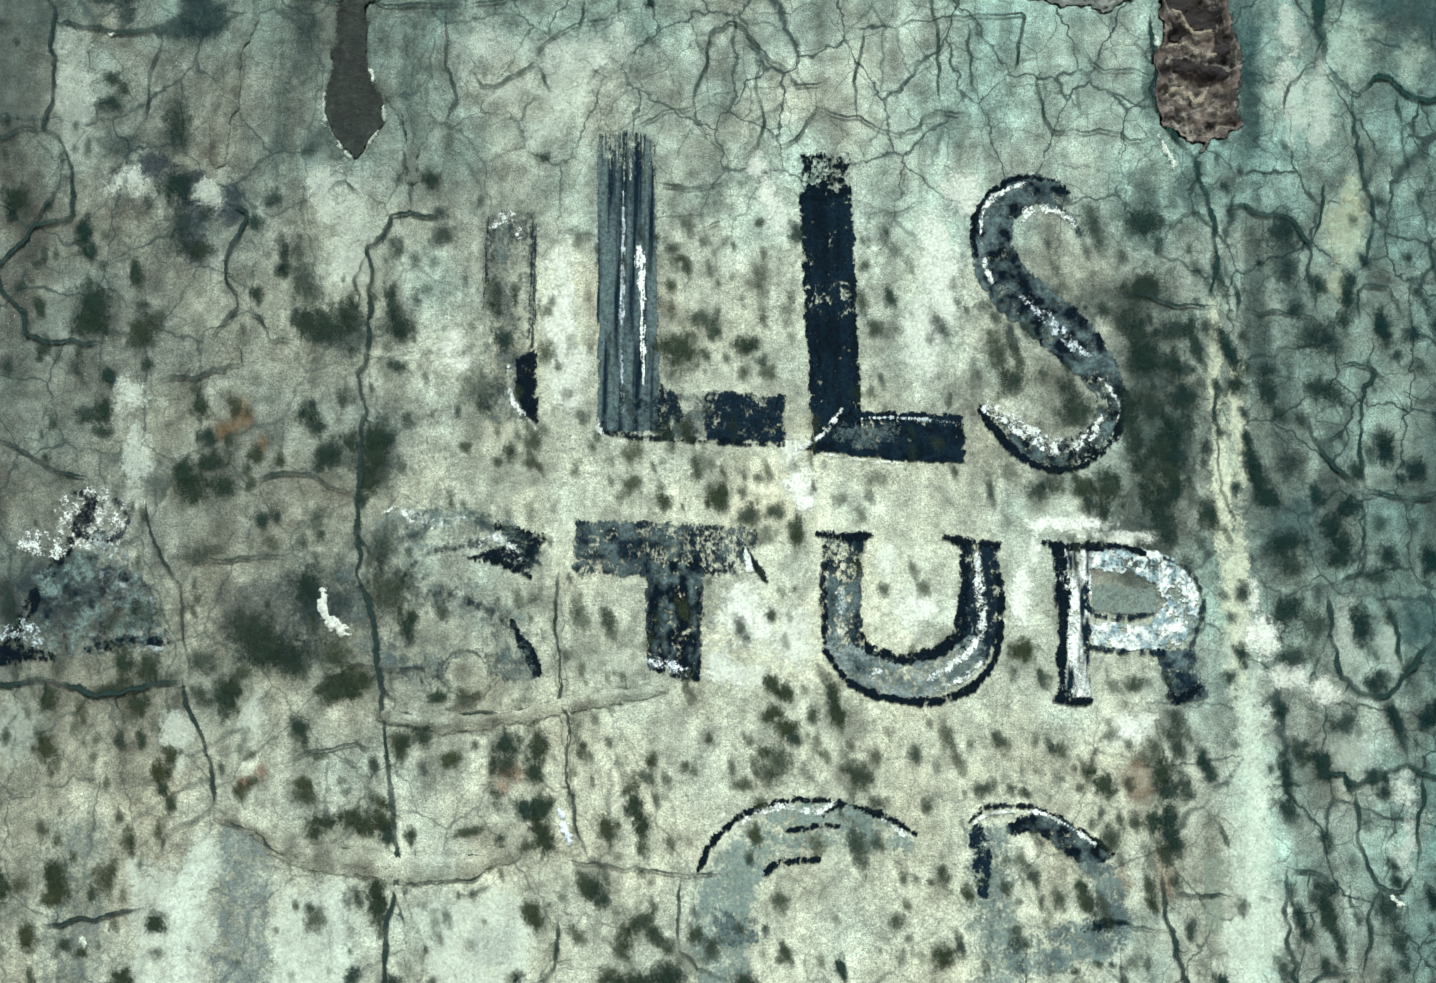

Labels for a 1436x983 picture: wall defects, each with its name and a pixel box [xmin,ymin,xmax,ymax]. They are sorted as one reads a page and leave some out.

spalling [322,0,386,158]
crack [645,0,1325,320]
spalling [1153,0,1244,169]
crack [1283,0,1436,312]
crack [263,102,715,983]
water stain [439,727,555,859]
water stain [597,752,689,855]
water stain [692,436,818,545]
water stain [705,579,886,869]
crack [1106,881,1226,983]
water stain [1001,204,1436,983]
crack [1282,345,1436,983]